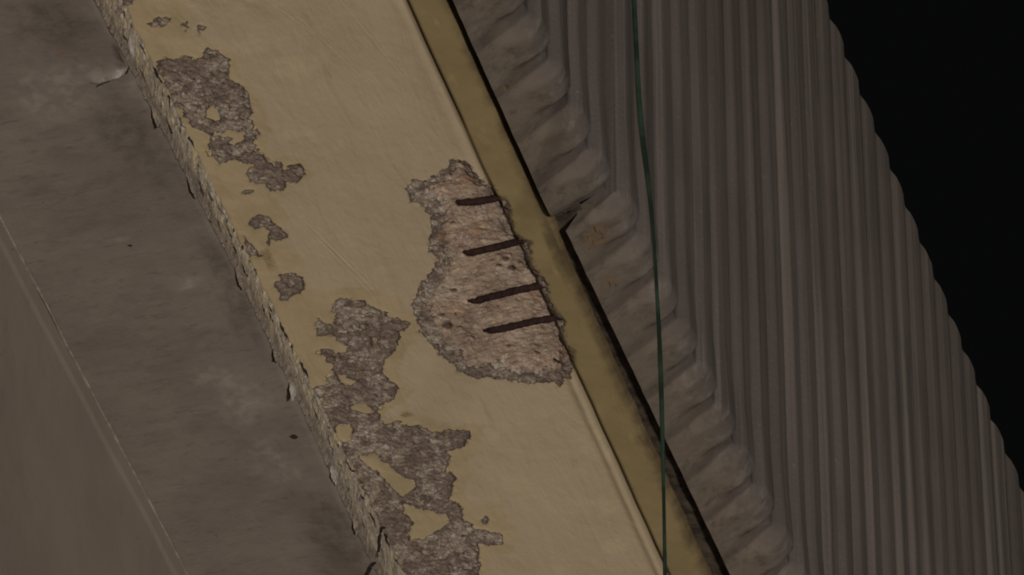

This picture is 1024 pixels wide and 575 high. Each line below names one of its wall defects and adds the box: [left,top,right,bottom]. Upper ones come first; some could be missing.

spalling [94,0,573,575]